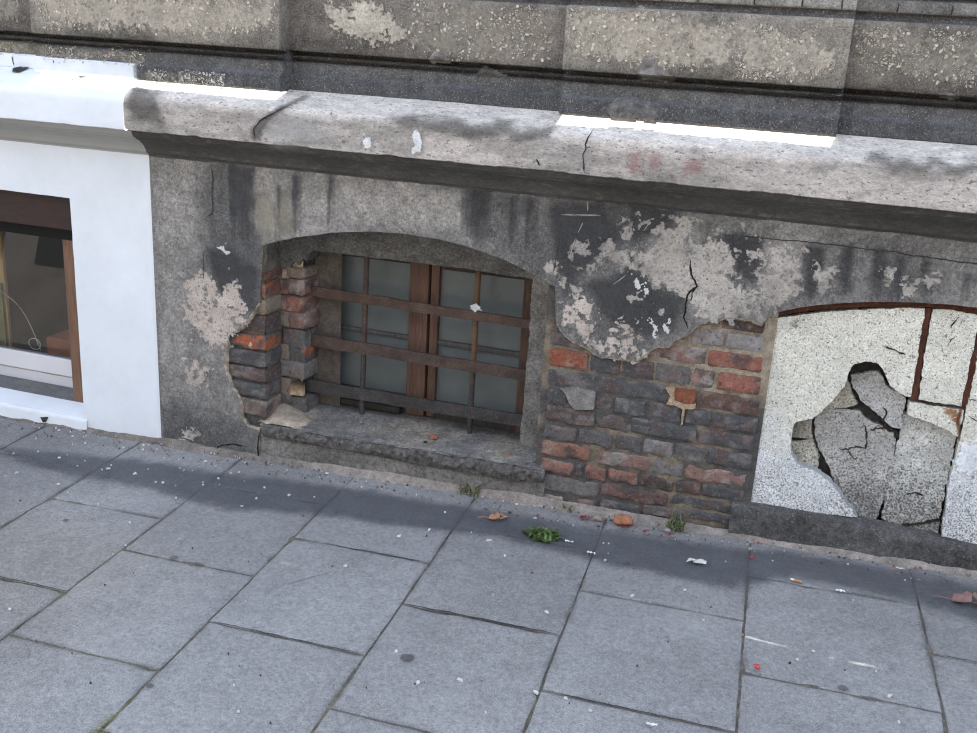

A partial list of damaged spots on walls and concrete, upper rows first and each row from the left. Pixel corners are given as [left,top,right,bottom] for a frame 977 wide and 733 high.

peeling [321,0,552,62]
peeling [565,6,836,83]
crack [683,260,698,328]
leakage [725,235,762,278]
leakage [804,246,823,296]
crack [722,234,977,264]
leakage [874,251,884,281]
spalling [176,211,841,529]
crack [839,407,899,460]
spalling [791,361,956,533]
crack [915,399,977,421]